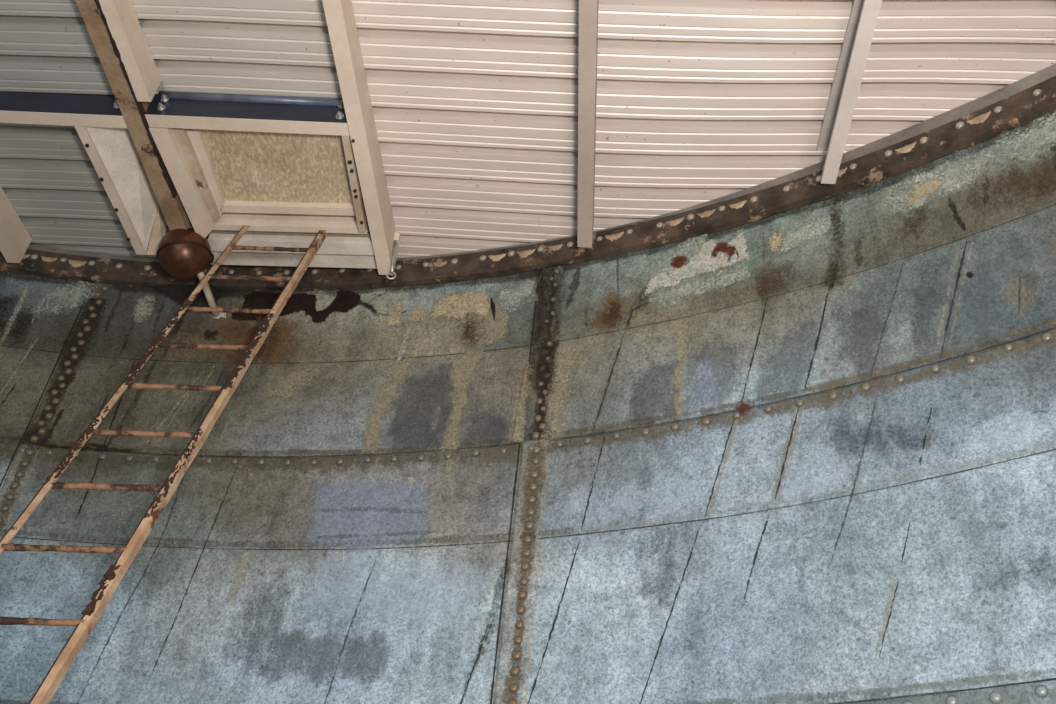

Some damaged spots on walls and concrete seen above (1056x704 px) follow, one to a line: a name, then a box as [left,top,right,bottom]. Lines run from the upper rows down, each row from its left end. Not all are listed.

corrosion [671,255,687,268]
peeling [642,231,751,308]
corrosion [711,242,739,260]
peeling [763,211,841,258]
corrosion [205,318,297,365]
crack [639,298,768,704]
crack [744,283,830,599]
crack [145,462,240,688]
crack [325,560,376,703]
crack [875,521,911,660]